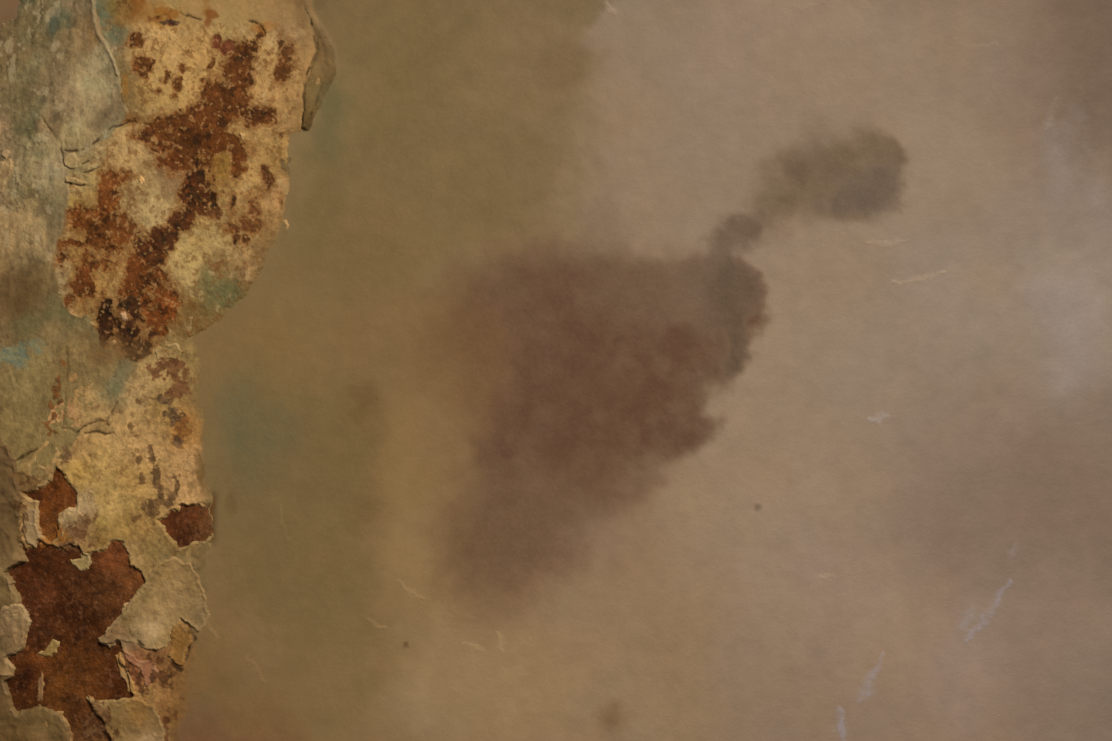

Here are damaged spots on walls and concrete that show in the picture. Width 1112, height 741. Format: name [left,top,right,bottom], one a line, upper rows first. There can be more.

corrosion [42,360,69,436]
flaking render [0,0,337,741]
corrosion [53,0,296,484]
leakage [444,129,906,594]
corrosion [78,700,120,741]